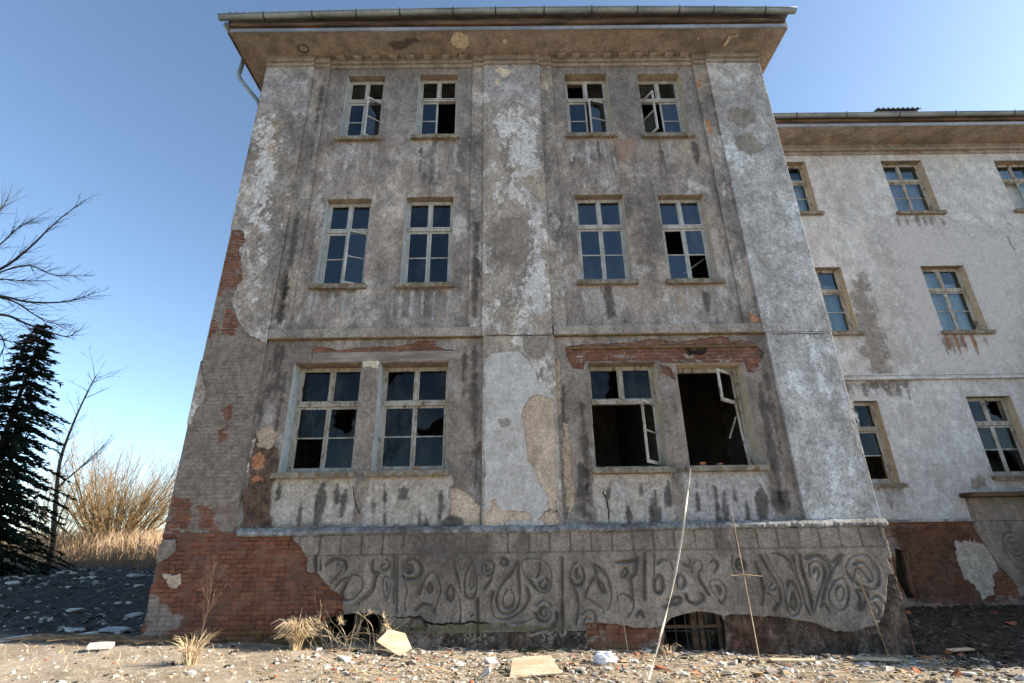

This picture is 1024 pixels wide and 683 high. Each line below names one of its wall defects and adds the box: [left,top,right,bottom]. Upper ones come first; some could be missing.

water stain [472,218,536,317]
flaking render [141,103,344,646]
water stain [241,347,463,550]
water stain [462,346,480,458]
spalling [449,335,764,526]
water stain [578,374,790,524]
rust [945,334,979,354]
crack [395,612,493,630]
spalling [586,623,665,651]
peeling [954,540,998,600]